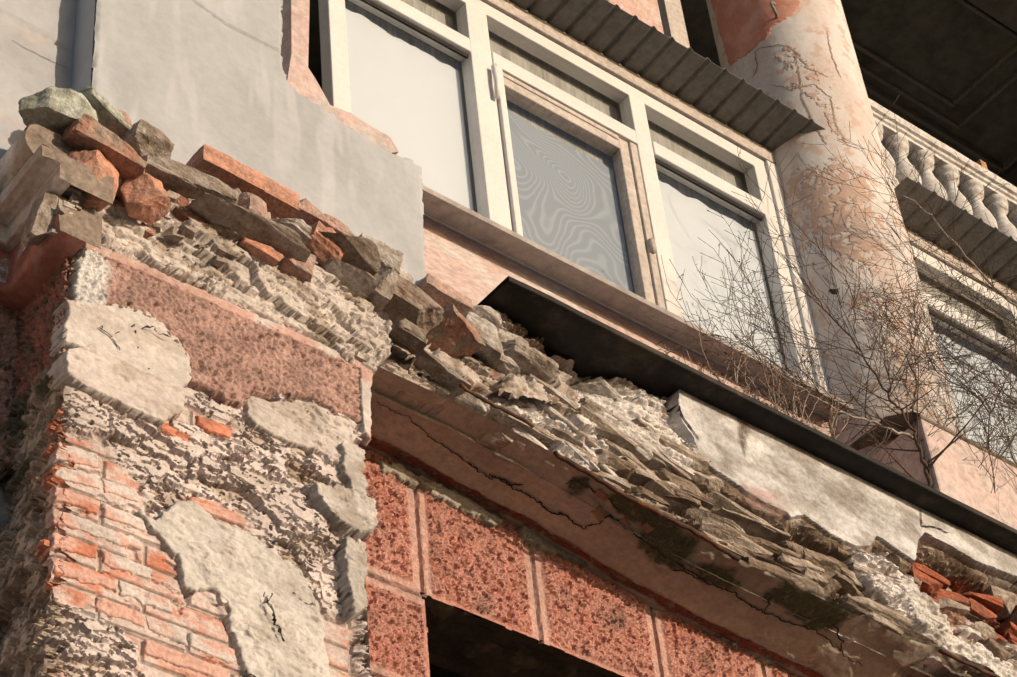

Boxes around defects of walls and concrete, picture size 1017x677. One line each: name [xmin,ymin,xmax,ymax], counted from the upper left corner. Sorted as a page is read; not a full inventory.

peeling [711,0,802,66]
flaking render [0,303,21,481]
flaking render [42,200,822,677]
crack [378,402,862,666]
crack [637,386,700,441]
spalling [419,356,1017,677]